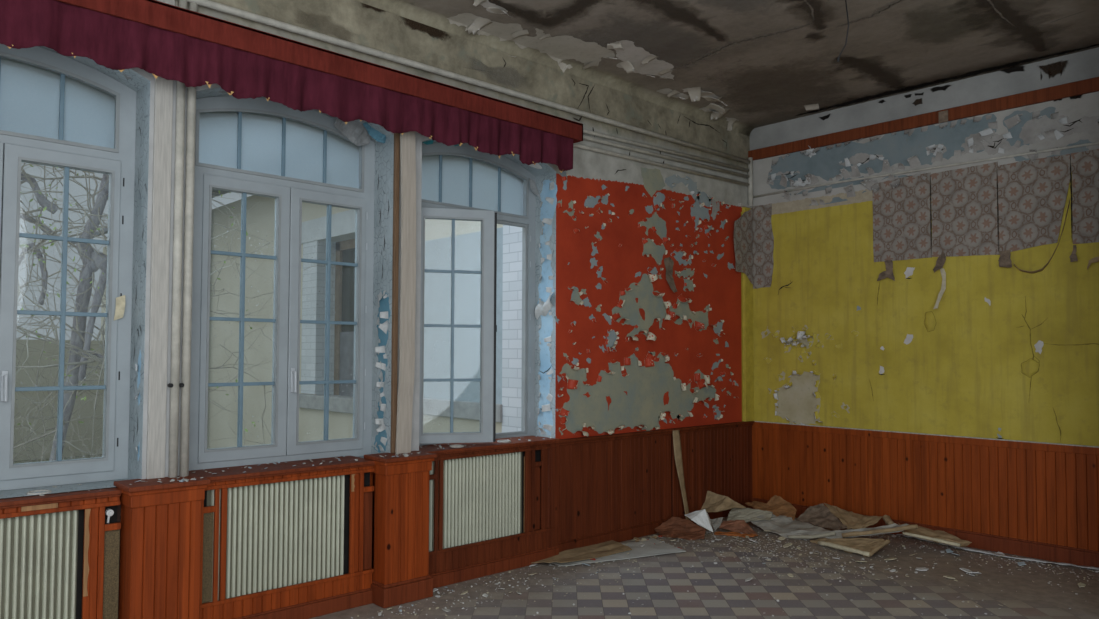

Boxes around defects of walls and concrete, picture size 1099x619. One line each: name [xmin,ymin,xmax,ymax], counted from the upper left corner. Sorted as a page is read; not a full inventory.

peeling [447,0,739,131]
damp [796,0,1099,120]
peeling [766,107,1092,206]
peeling [373,290,444,457]
peeling [496,167,739,441]
peeling [761,325,837,426]
crack [1020,297,1099,397]